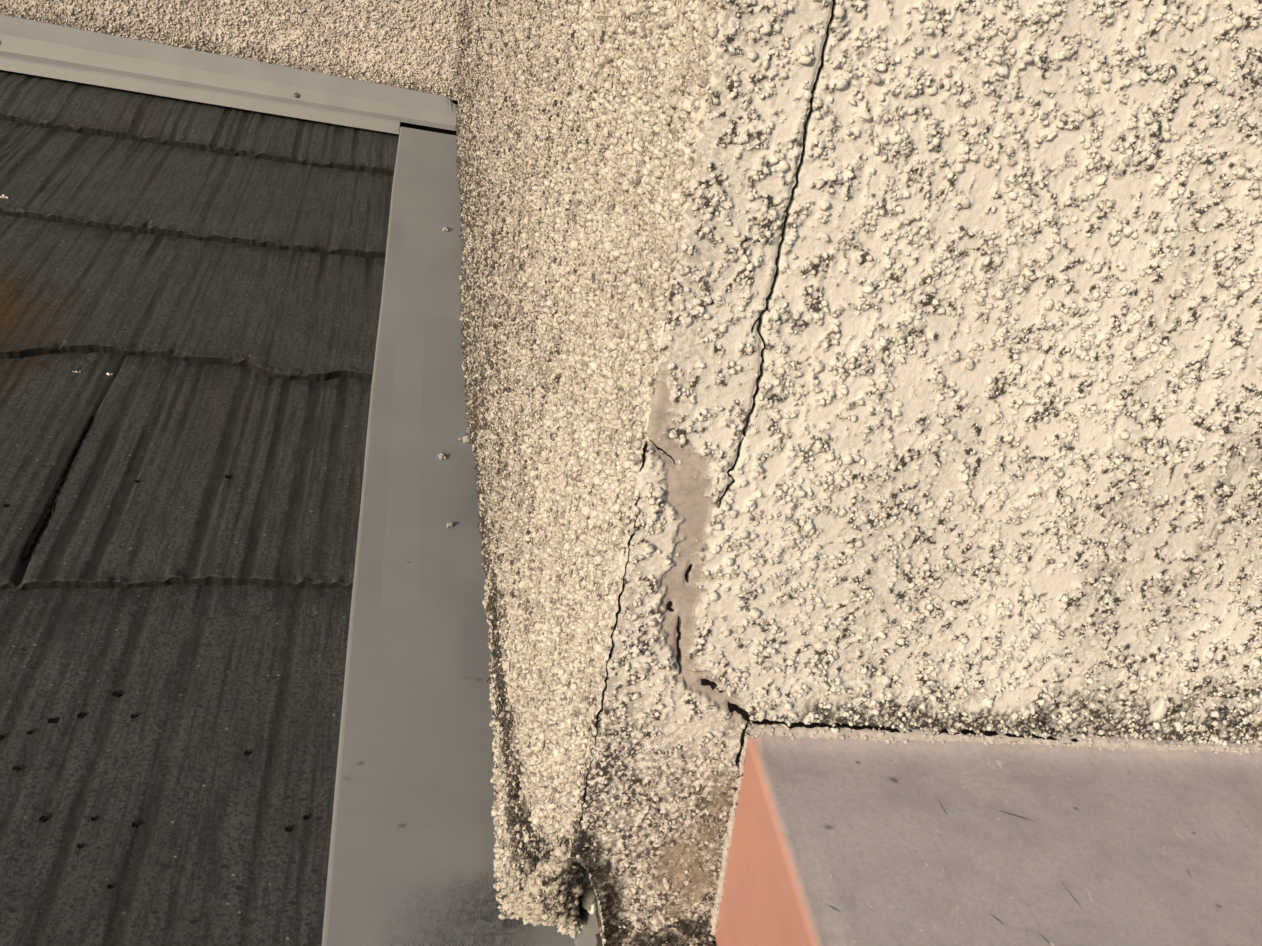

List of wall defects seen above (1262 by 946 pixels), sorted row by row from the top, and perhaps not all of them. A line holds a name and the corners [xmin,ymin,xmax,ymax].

crack [718,0,835,509]
crack [579,439,676,823]
spalling [644,363,750,723]
damp [570,760,744,946]